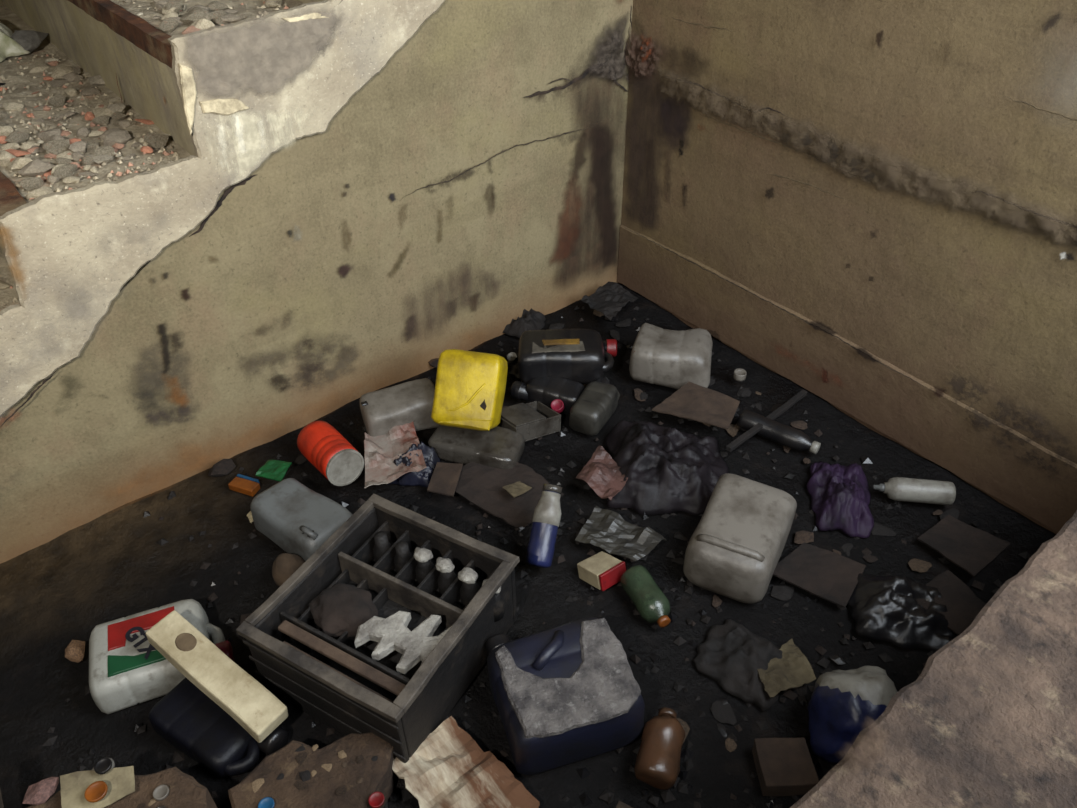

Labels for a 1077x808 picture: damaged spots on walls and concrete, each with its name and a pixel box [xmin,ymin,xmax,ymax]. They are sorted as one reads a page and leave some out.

crack [523,68,590,98]
crack [189,175,256,237]
crack [406,126,593,196]
damp [559,83,617,283]
damp [627,73,689,226]
crack [1,369,58,426]
damp [136,324,188,421]
damp [274,340,357,390]